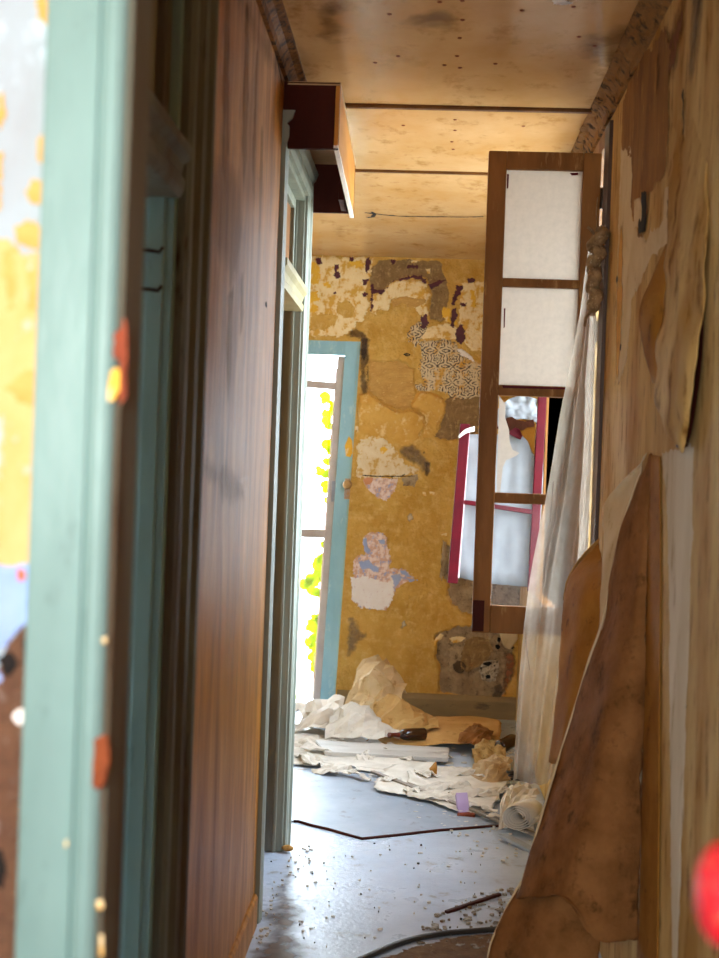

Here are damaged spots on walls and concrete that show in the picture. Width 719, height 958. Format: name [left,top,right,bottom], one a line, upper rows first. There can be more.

peeling [36,0,47,25]
peeling [25,179,41,205]
peeling [309,255,484,351]
peeling [616,147,668,384]
peeling [345,426,435,501]
peeling [0,218,40,958]
peeling [350,532,418,611]
flaking render [434,626,518,697]